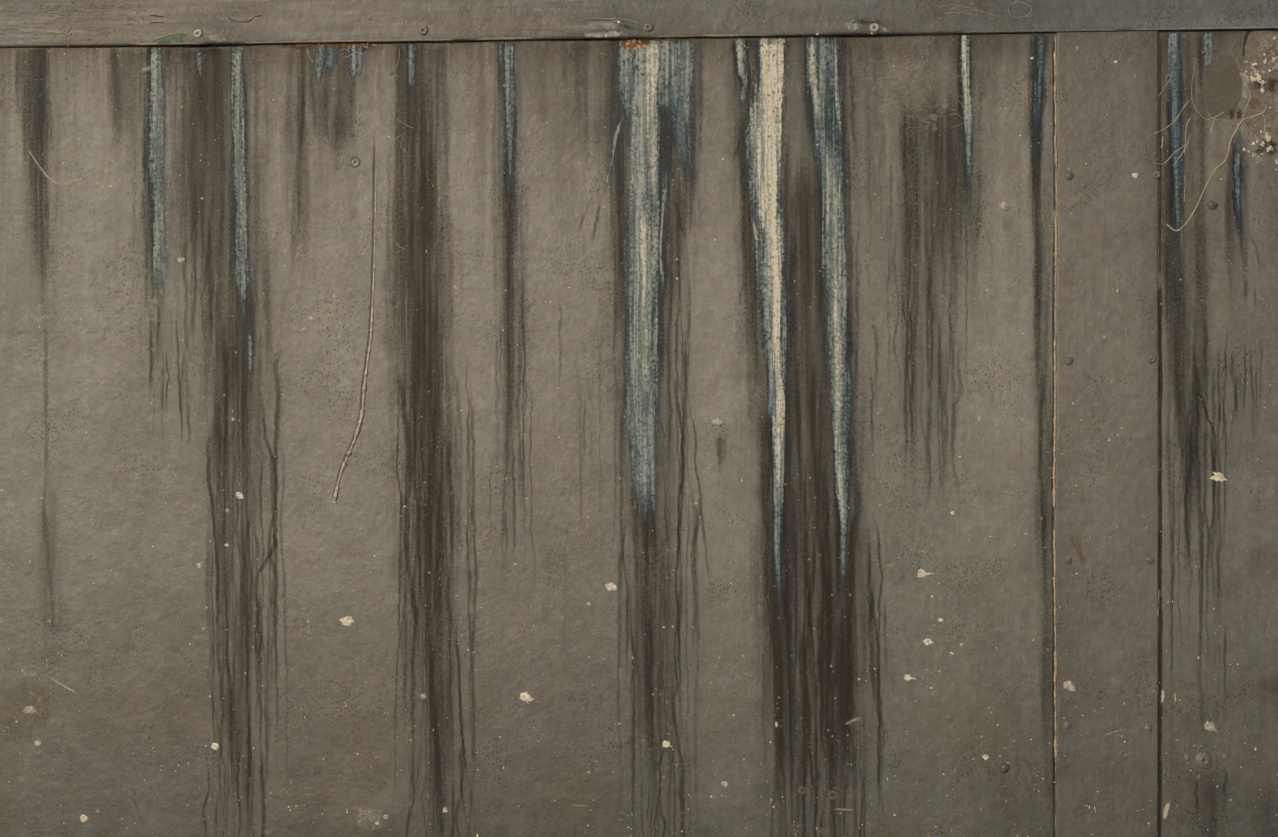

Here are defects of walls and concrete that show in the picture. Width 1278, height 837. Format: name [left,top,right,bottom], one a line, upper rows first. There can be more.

damp [143,48,167,285]
damp [191,46,269,414]
damp [394,44,453,613]
damp [497,42,524,395]
damp [604,39,702,778]
damp [732,37,860,815]
damp [933,35,975,253]
damp [1161,32,1221,508]
damp [1228,142,1243,238]
peeling [1202,30,1278,170]